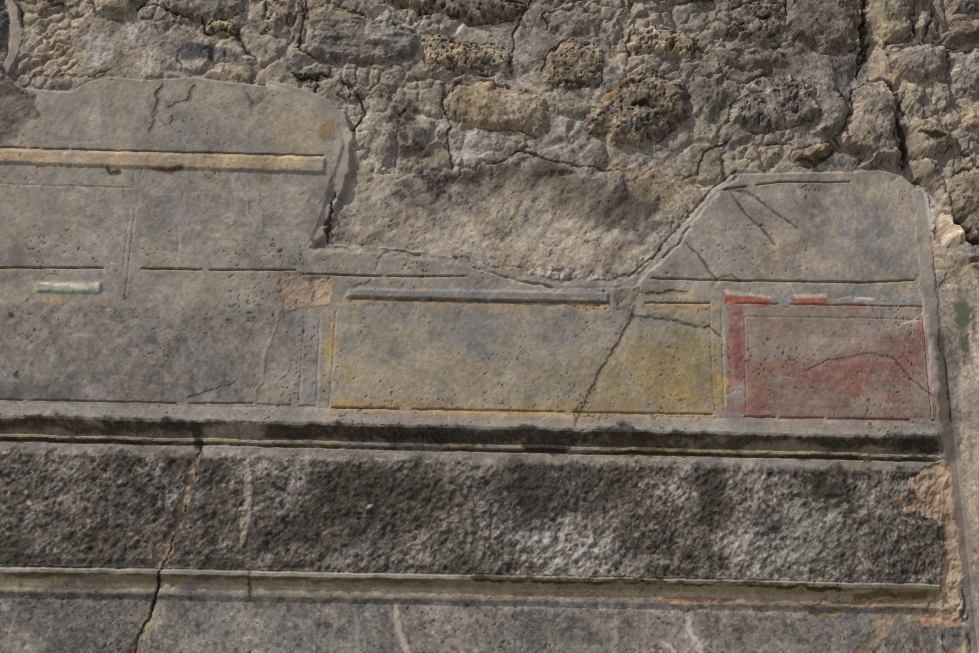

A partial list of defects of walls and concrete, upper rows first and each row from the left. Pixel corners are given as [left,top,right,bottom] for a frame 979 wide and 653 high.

crack [892,9,934,45]
flaking render [0,55,40,143]
flaking render [153,165,184,174]
flaking render [714,144,798,172]
crack [726,189,791,236]
crack [575,312,719,421]
damp [0,404,231,448]
damp [261,419,939,526]
crack [129,447,202,653]
flaking render [804,464,964,653]
spalling [664,596,735,606]